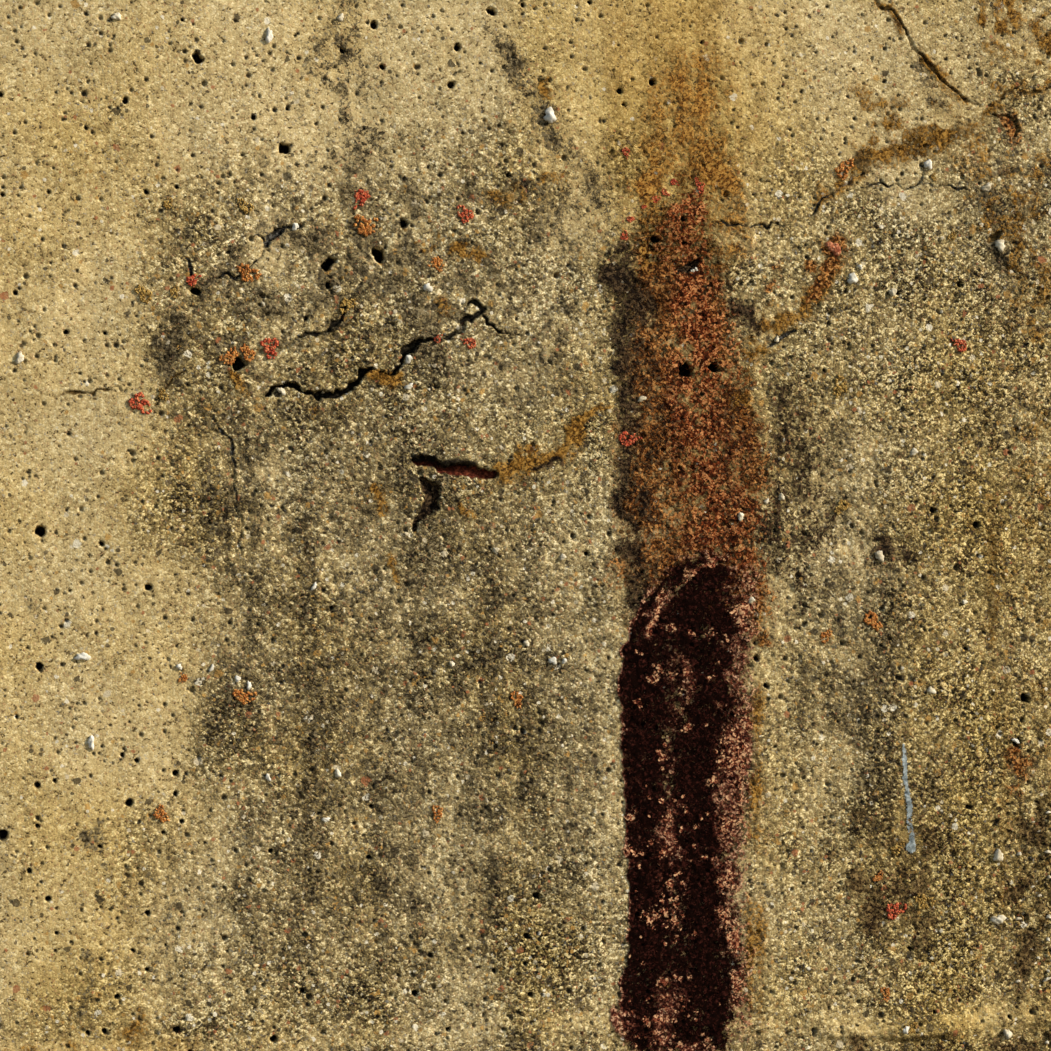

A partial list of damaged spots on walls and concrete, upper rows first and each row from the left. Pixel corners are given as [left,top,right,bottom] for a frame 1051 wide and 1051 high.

crack [881,6,1051,137]
crack [717,173,967,230]
crack [176,225,300,288]
crack [302,283,362,337]
crack [265,299,520,401]
leakage [145,0,624,1006]
rust [479,0,850,1051]
leakage [78,820,108,871]
leakage [72,949,97,1020]
leakage [506,1028,544,1051]